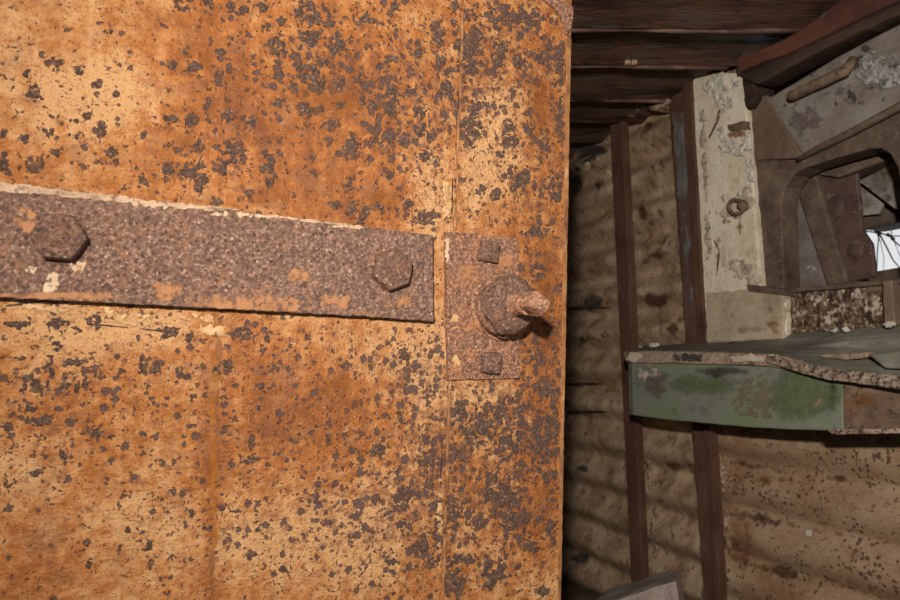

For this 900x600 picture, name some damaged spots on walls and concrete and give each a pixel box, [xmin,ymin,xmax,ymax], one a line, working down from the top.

corrosion [22,69,44,102]
corrosion [0,102,119,175]
corrosion [44,56,86,75]
corrosion [161,0,437,225]
corrosion [429,0,565,205]
corrosion [402,198,452,226]
corrosion [45,314,102,335]
corrosion [156,326,233,380]
corrosion [18,341,96,477]
corrosion [417,379,559,494]
corrosion [414,496,509,600]
corrosion [472,471,557,554]